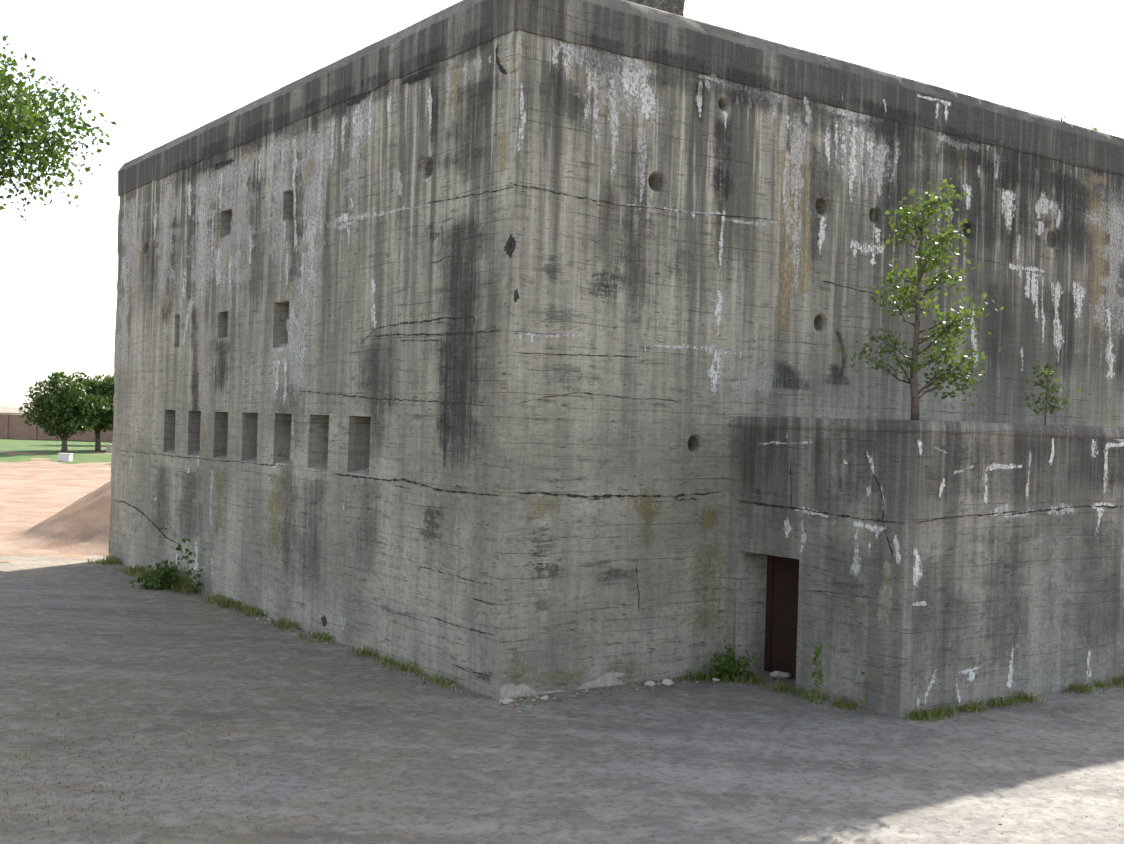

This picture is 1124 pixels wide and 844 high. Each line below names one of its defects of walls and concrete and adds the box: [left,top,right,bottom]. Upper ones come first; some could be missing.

water stain [413,32,491,169]
water stain [552,42,1095,368]
water stain [440,220,485,457]
water stain [645,290,742,395]
efflorescence [1105,303,1116,381]
crack [118,450,299,467]
crack [113,500,179,544]
crack [417,566,494,605]
crack [335,449,1124,563]
water stain [784,506,835,553]
water stain [850,521,922,587]
crack [428,616,495,636]